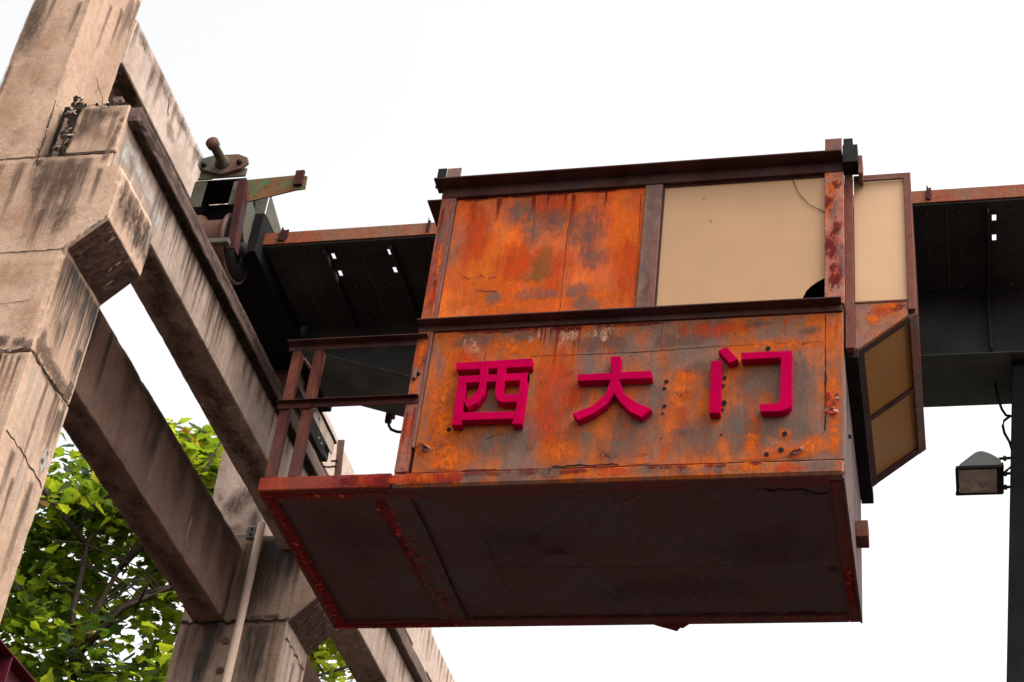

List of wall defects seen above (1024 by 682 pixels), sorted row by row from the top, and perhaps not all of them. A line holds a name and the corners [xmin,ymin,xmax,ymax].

leakage [21,0,56,43]
leakage [12,158,102,230]
leakage [79,67,283,481]
rust [452,235,629,315]
rust [867,303,905,324]
crack [6,429,42,488]
leakage [124,358,299,613]
rust [260,350,510,629]
rust [460,325,623,478]
rust [660,370,702,452]
rust [734,371,840,472]
leakage [176,624,225,682]